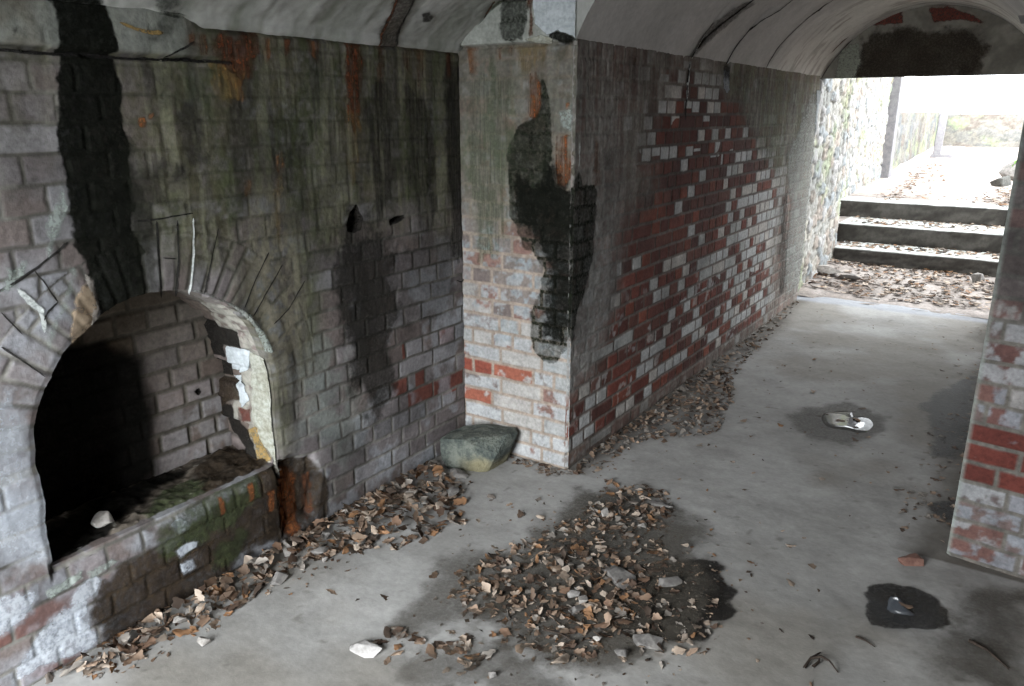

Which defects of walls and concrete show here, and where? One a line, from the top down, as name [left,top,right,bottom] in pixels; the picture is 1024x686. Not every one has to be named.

crack [0,42,233,65]
corrosion [344,42,362,132]
crack [685,0,833,120]
damp [836,26,990,78]
damp [48,0,163,314]
corrosion [556,103,580,185]
damp [5,264,25,290]
peeling [194,290,276,464]
corrosion [267,457,328,543]
damp [0,469,280,679]